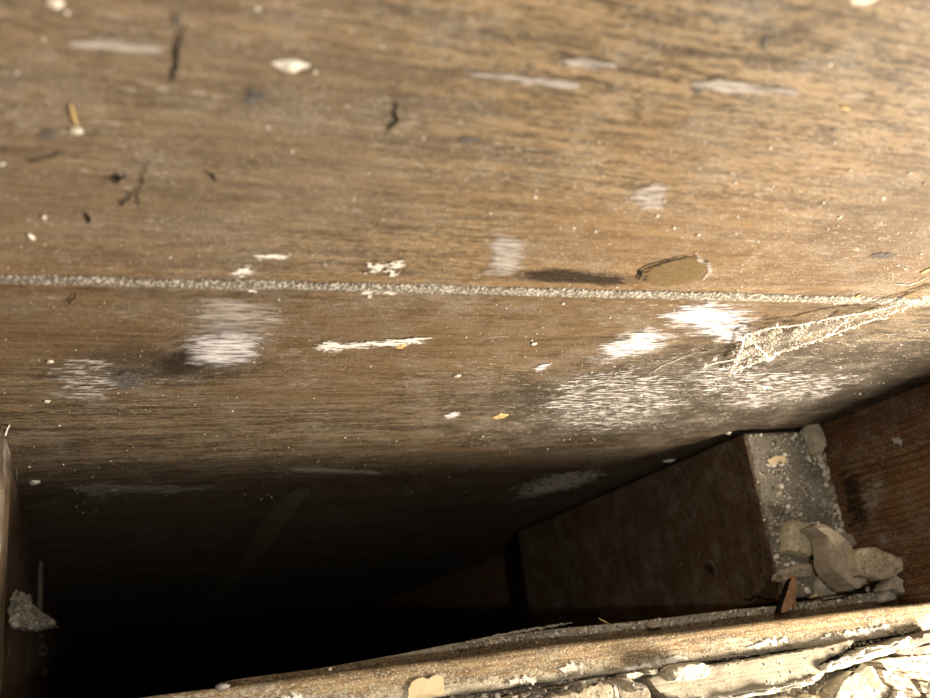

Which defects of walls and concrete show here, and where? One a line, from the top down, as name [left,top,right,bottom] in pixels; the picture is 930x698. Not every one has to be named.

water stain [153,290,279,375]
water stain [313,338,431,352]
water stain [602,329,665,359]
water stain [660,303,747,343]
water stain [511,470,616,501]